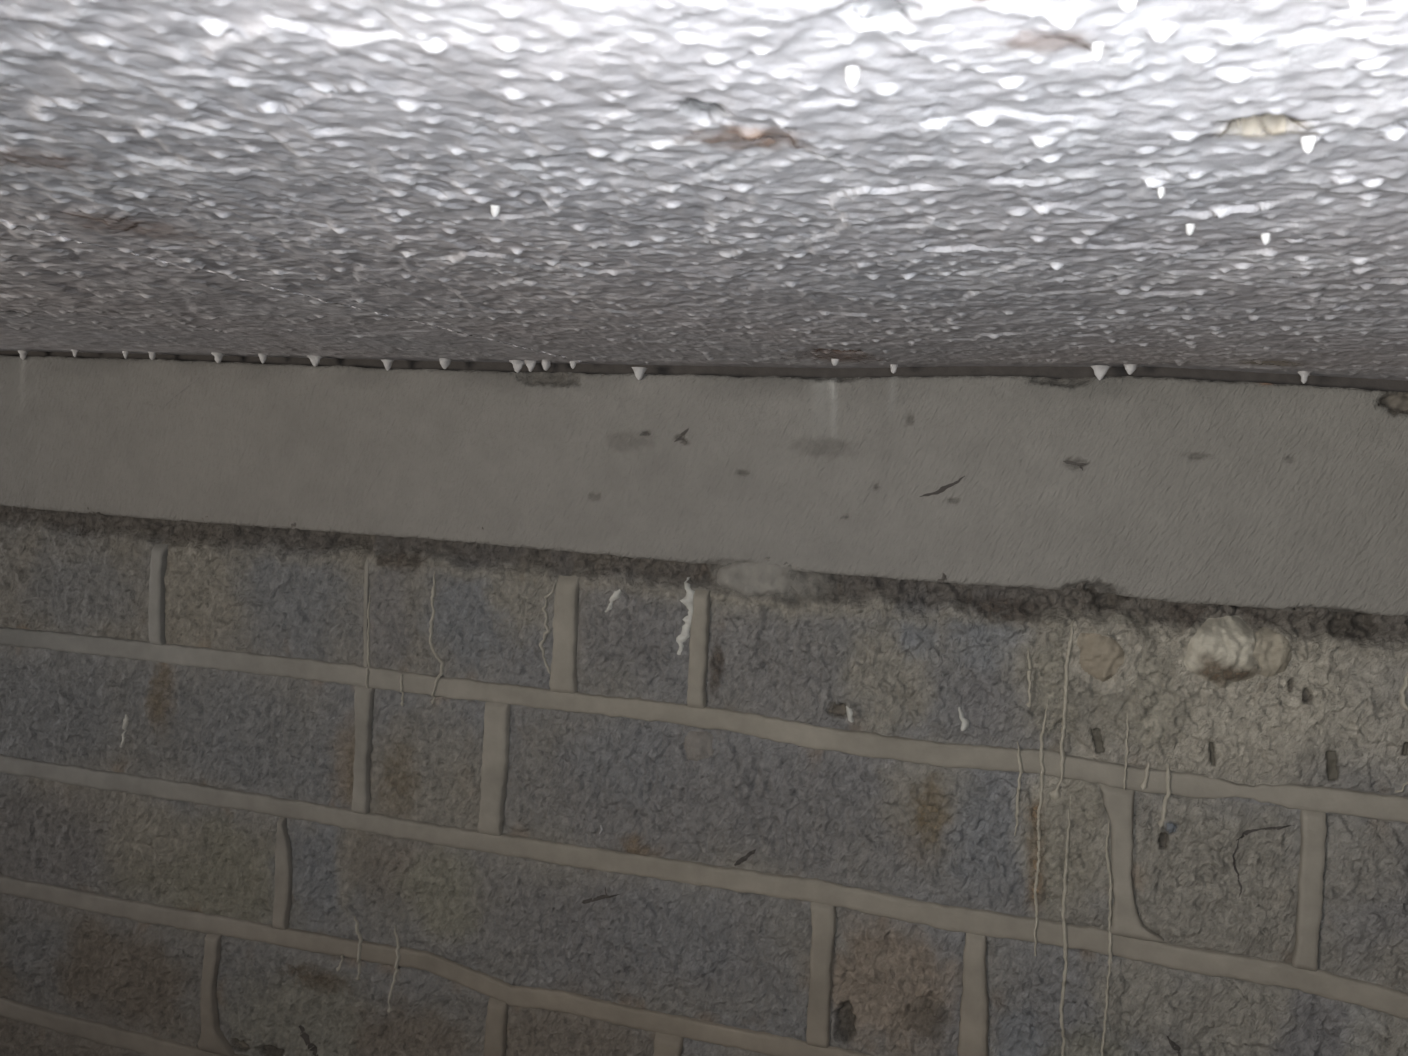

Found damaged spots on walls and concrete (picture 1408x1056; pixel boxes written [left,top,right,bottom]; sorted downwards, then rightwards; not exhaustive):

spalling [1066,583,1126,608]
spalling [1330,612,1376,639]
damp [1123,712,1171,827]
damp [1014,619,1075,1056]
damp [1101,820,1113,1056]